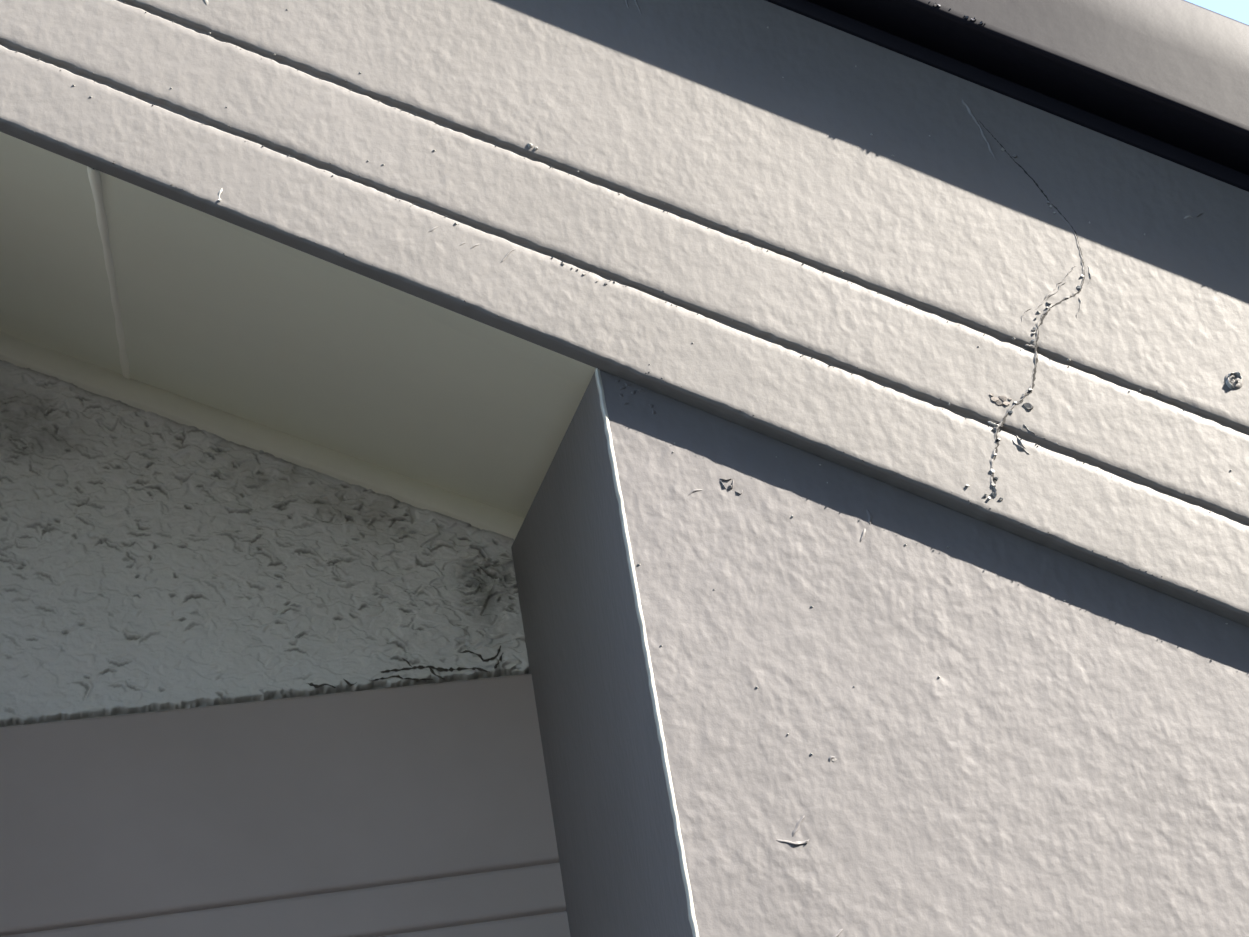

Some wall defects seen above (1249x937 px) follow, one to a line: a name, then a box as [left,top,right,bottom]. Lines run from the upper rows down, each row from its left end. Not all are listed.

crack [962,99,1091,497]